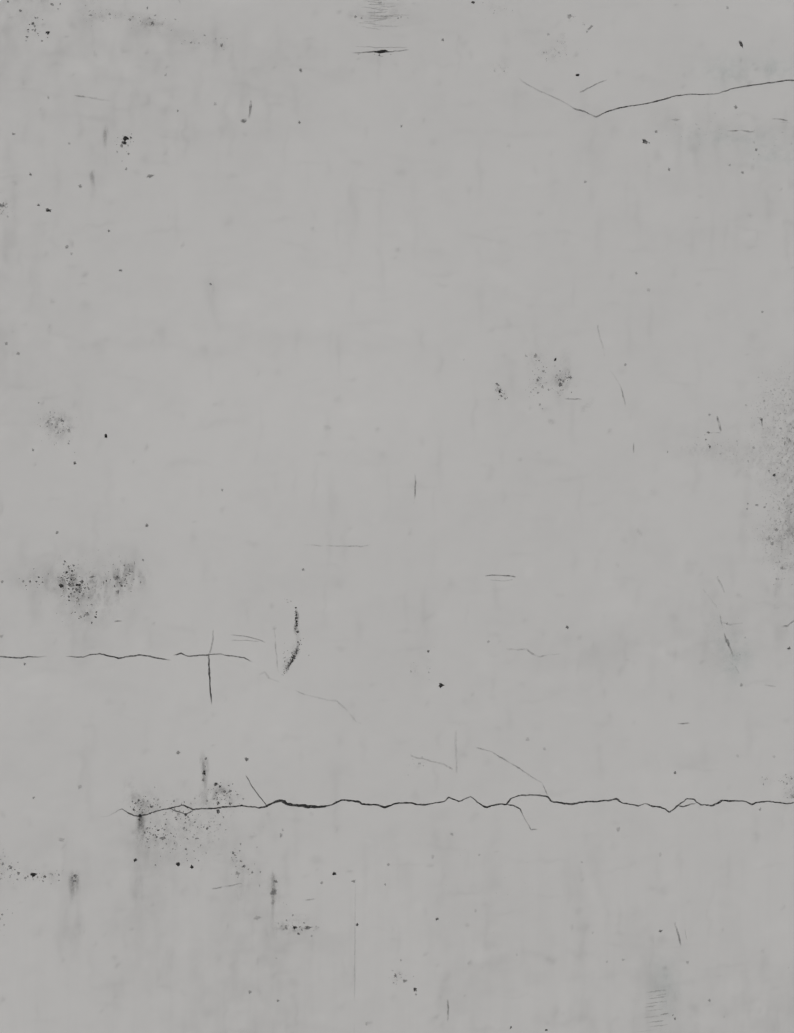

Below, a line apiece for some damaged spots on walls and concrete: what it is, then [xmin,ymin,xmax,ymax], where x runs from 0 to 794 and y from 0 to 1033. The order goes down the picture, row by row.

crack [89,653,248,698]
crack [127,787,793,817]